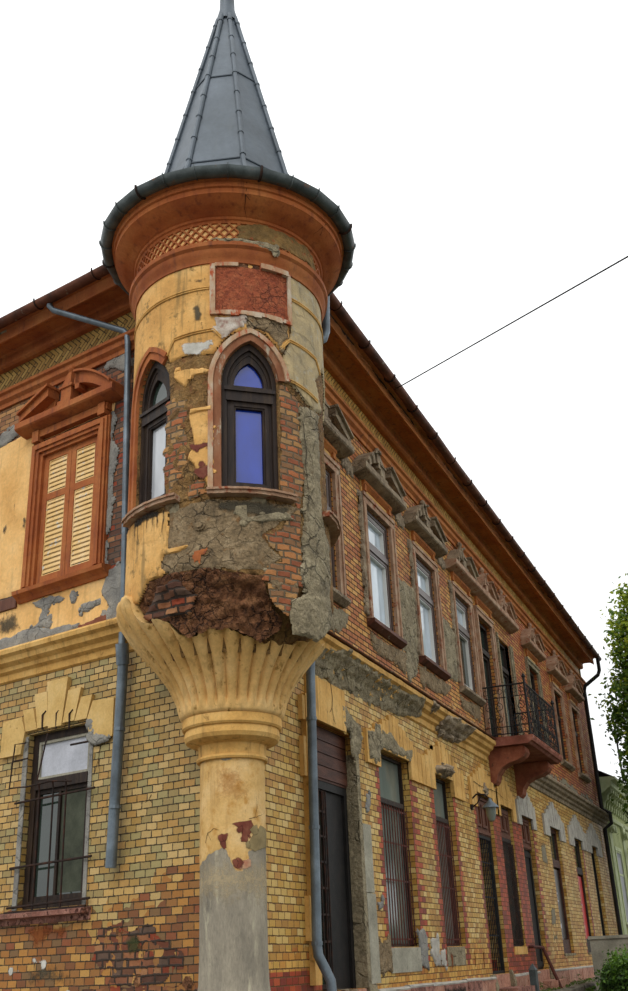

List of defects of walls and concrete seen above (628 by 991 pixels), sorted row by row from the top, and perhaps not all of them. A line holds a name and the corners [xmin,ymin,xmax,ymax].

spalling [210,224,315,271]
spalling [0,397,32,433]
spalling [107,315,306,643]
peeling [69,590,107,628]
spalling [315,648,480,744]
peeling [218,820,267,869]